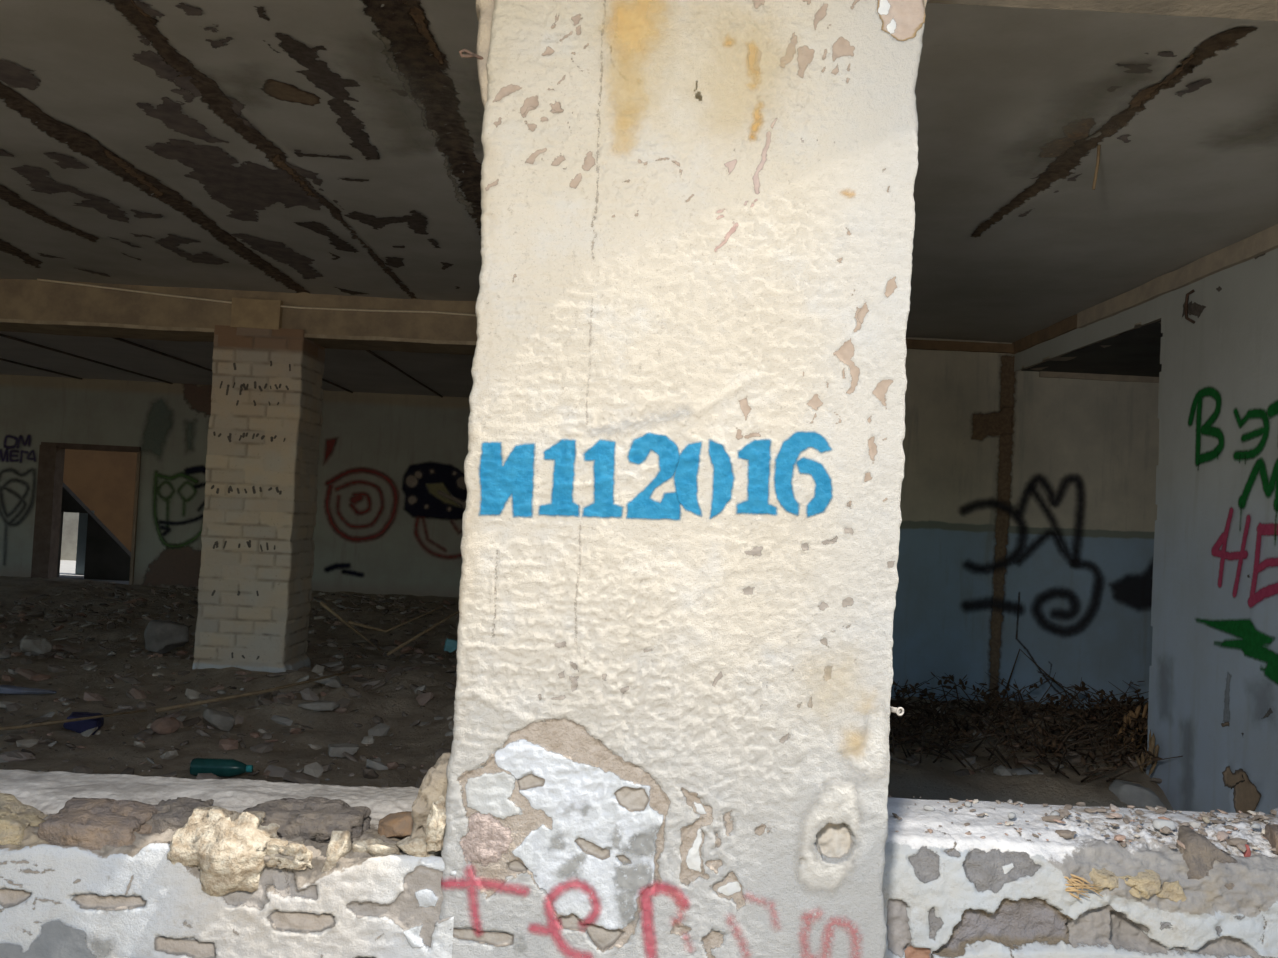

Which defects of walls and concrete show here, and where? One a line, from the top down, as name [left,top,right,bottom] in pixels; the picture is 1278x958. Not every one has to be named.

peeling [779,0,855,83]
peeling [877,0,926,41]
peeling [133,0,454,279]
rust [750,104,761,139]
peeling [0,149,229,265]
spalling [1222,766,1261,814]
spalling [457,718,746,952]
spalling [0,860,146,935]
spalling [154,921,216,958]
spalling [222,867,336,933]
spalling [347,865,514,948]
spalling [886,846,1262,958]